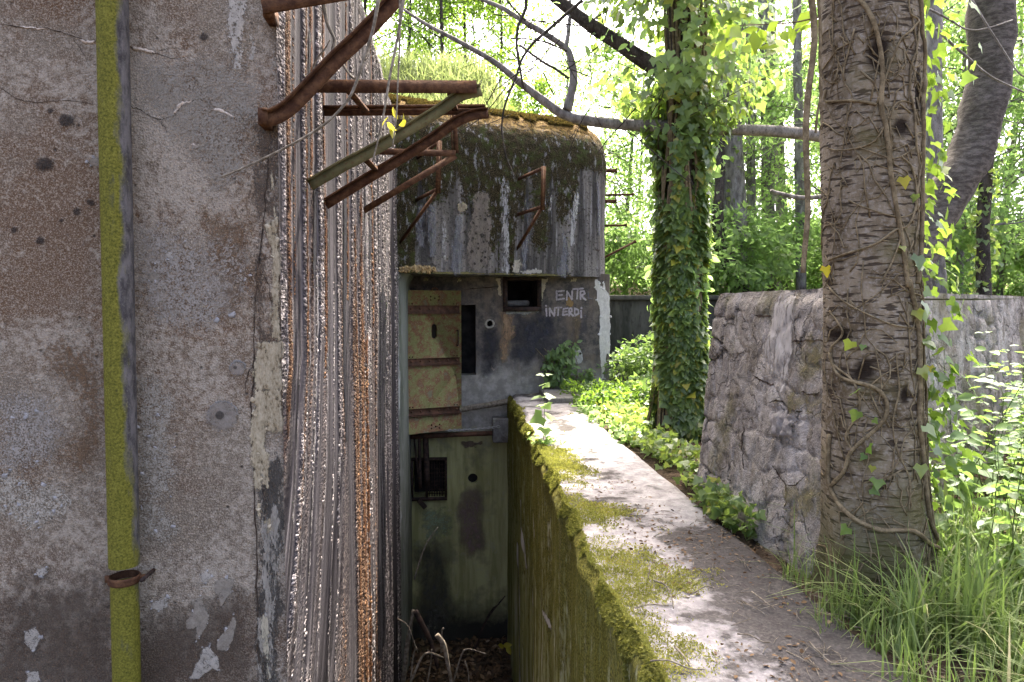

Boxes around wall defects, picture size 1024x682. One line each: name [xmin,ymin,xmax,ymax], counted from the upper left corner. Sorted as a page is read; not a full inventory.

crack [1,24,96,66]
crack [131,46,186,61]
flaking render [249,207,285,490]
peeling [594,279,612,380]
damp [363,179,579,682]
flaking render [255,503,274,534]
spalling [24,626,44,652]
spalling [185,569,236,680]